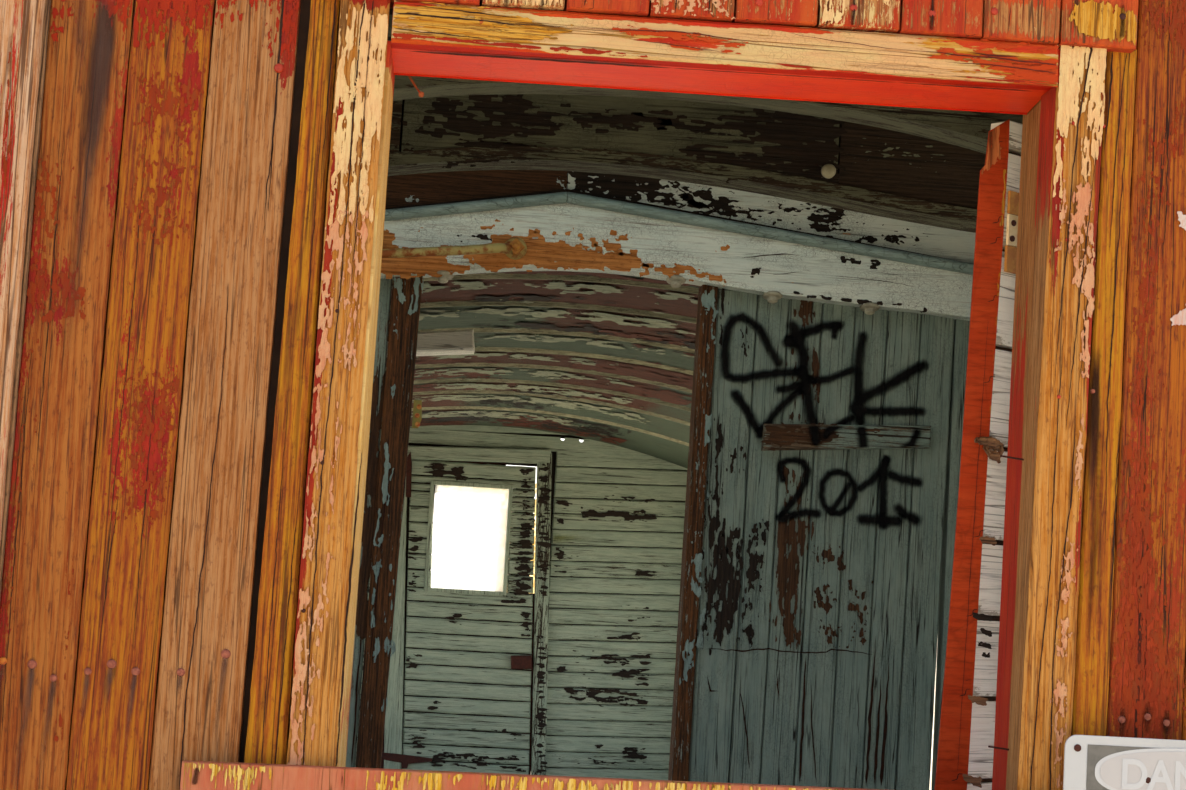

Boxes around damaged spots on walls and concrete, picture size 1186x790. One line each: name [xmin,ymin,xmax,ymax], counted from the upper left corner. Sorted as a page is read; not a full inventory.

peeling [820,0,847,24]
peeling [50,0,299,255]
peeling [287,0,648,765]
peeling [381,219,873,685]
peeling [394,94,928,246]
peeling [793,291,927,329]
peeling [840,256,881,269]
peeling [928,0,1137,378]
peeling [366,464,731,790]
peeling [193,763,272,790]
peeling [963,774,982,788]